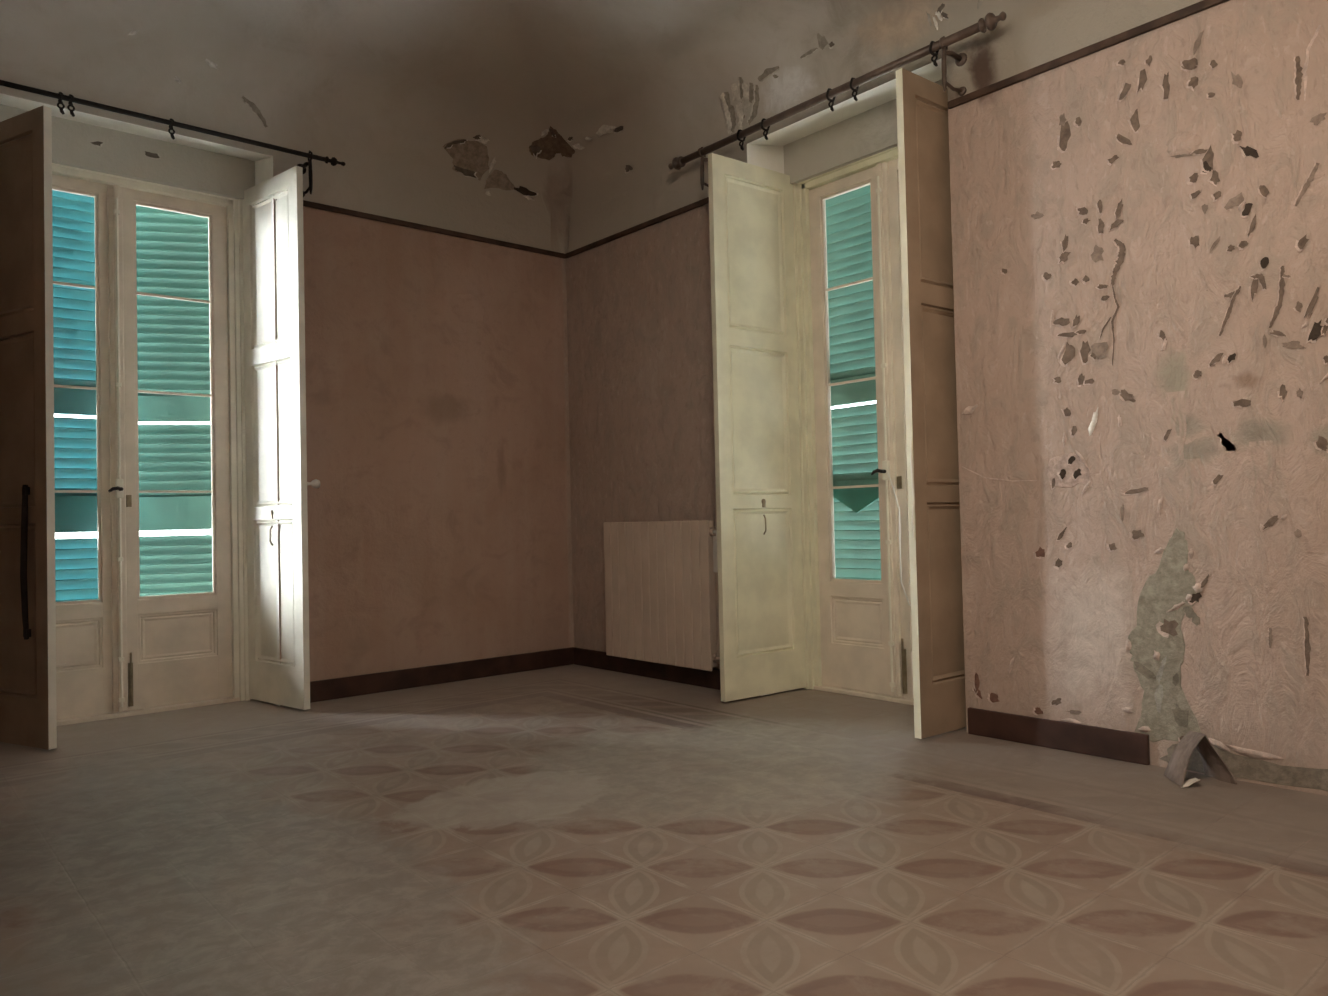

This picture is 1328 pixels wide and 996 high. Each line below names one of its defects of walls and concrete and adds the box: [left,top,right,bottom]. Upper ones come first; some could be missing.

peeling [1105,30,1243,166]
spalling [443,135,538,201]
peeling [1050,113,1082,170]
peeling [1187,145,1269,254]
peeling [1231,130,1259,158]
peeling [1249,257,1269,301]
peeling [1050,310,1109,387]
peeling [1192,353,1236,380]
peeling [1263,287,1328,349]
spalling [1046,408,1098,494]
peeling [1033,527,1072,570]
spalling [1115,528,1328,791]